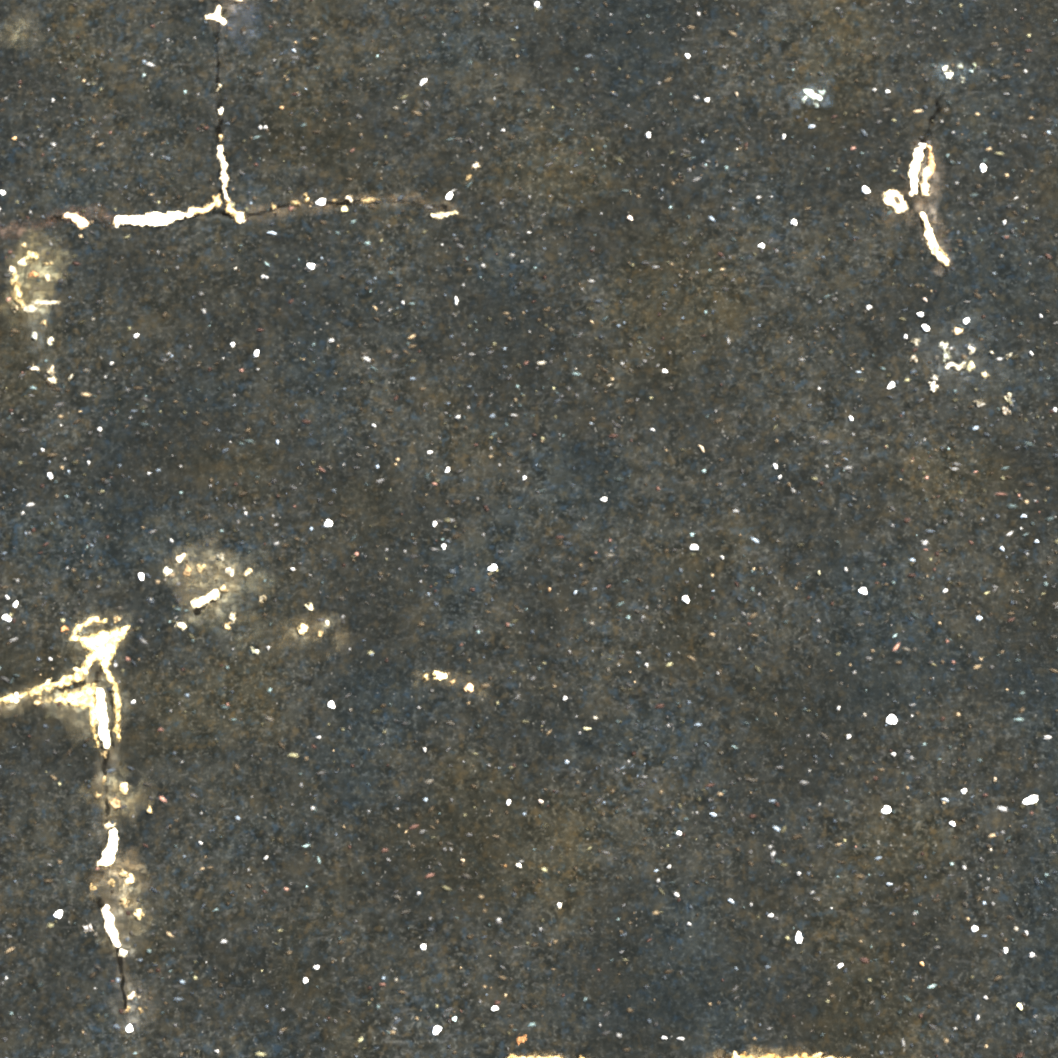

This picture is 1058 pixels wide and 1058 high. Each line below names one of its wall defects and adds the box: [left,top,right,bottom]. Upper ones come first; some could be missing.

crack [114,0,376,227]
crack [908,100,948,266]
crack [51,213,88,228]
crack [430,205,458,219]
spalling [508,1036,560,1058]